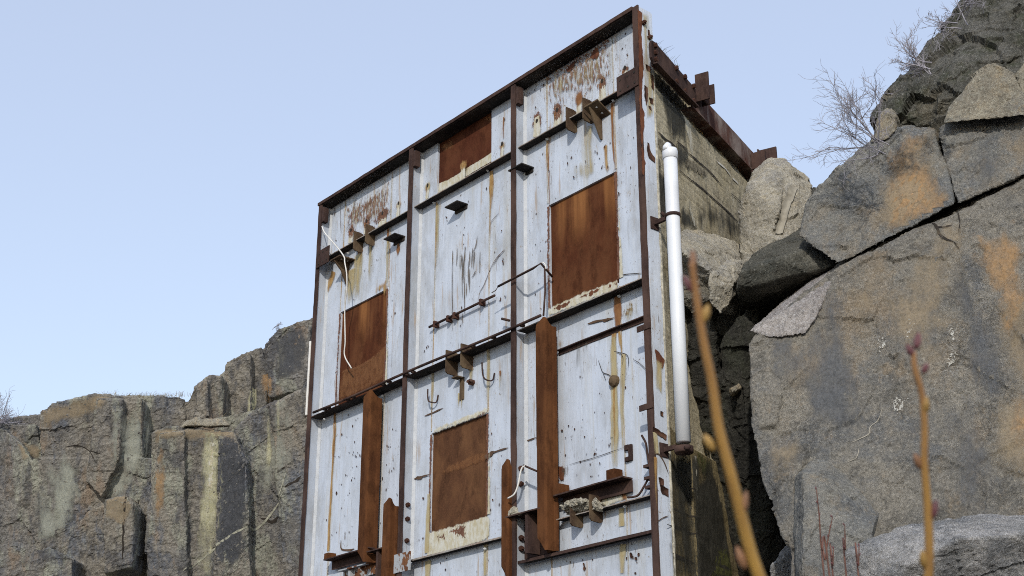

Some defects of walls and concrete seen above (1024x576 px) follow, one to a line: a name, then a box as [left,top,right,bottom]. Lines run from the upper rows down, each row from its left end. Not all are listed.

rust [347,201,400,298]
rust [340,348,385,398]
rust [610,296,633,462]
rust [327,413,336,551]
water stain [672,456,731,576]